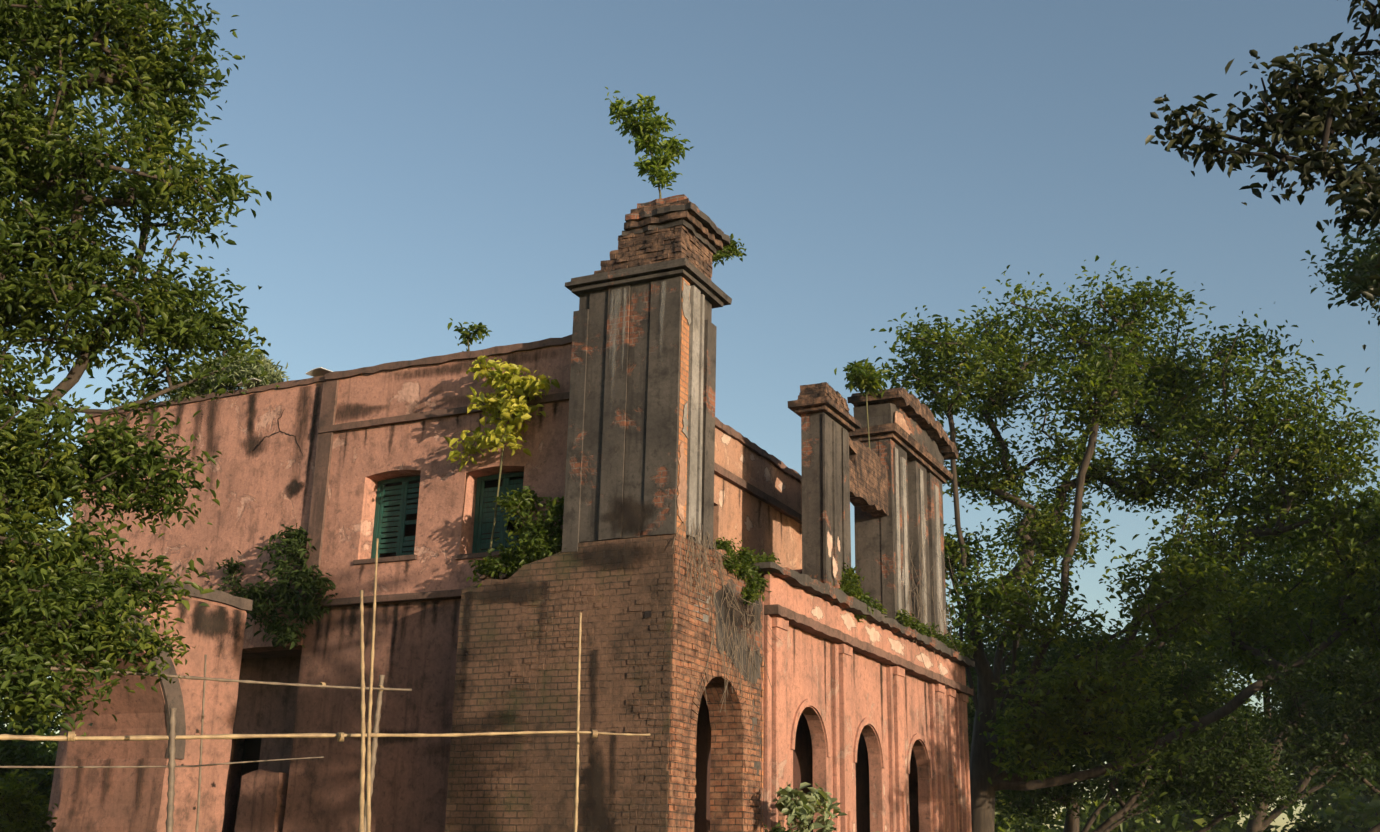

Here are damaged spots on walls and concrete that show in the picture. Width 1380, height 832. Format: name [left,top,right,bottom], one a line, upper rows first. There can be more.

water stain [610,289,626,371]
water stain [176,400,217,453]
water stain [244,394,263,455]
water stain [297,384,321,495]
water stain [314,591,472,691]
water stain [358,730,413,743]
water stain [580,650,616,832]
flaking render [693,576,785,832]